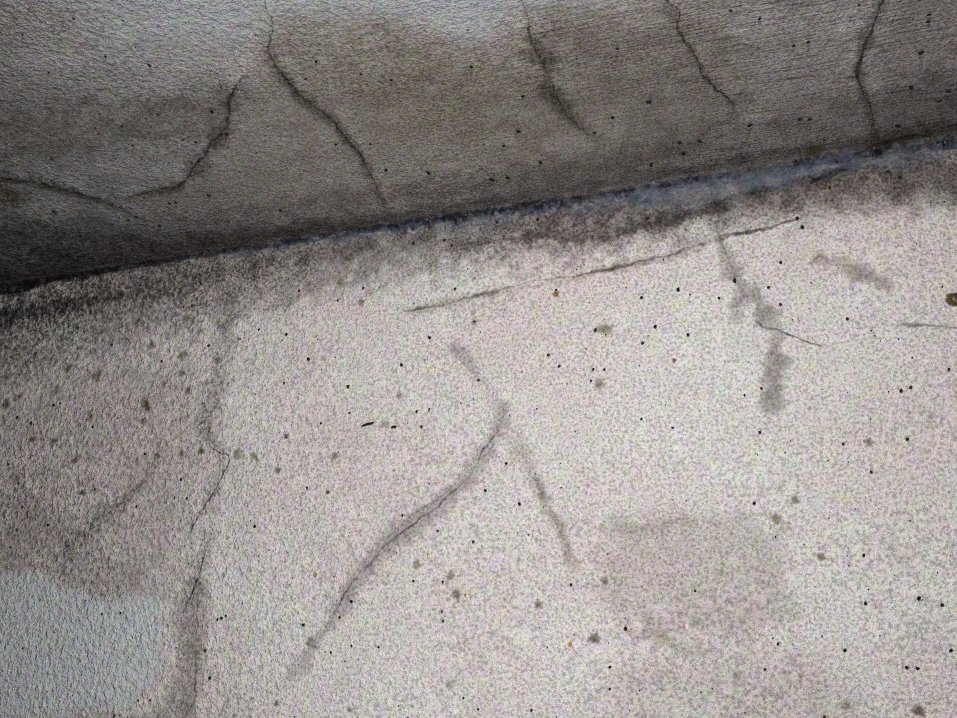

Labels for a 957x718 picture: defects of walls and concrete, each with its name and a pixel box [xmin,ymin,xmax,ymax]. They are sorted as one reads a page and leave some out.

crack [3,82,239,209]
crack [267,38,377,189]
crack [527,24,577,124]
crack [666,0,732,103]
damp [739,139,957,229]
crack [855,0,884,107]
damp [0,176,730,371]